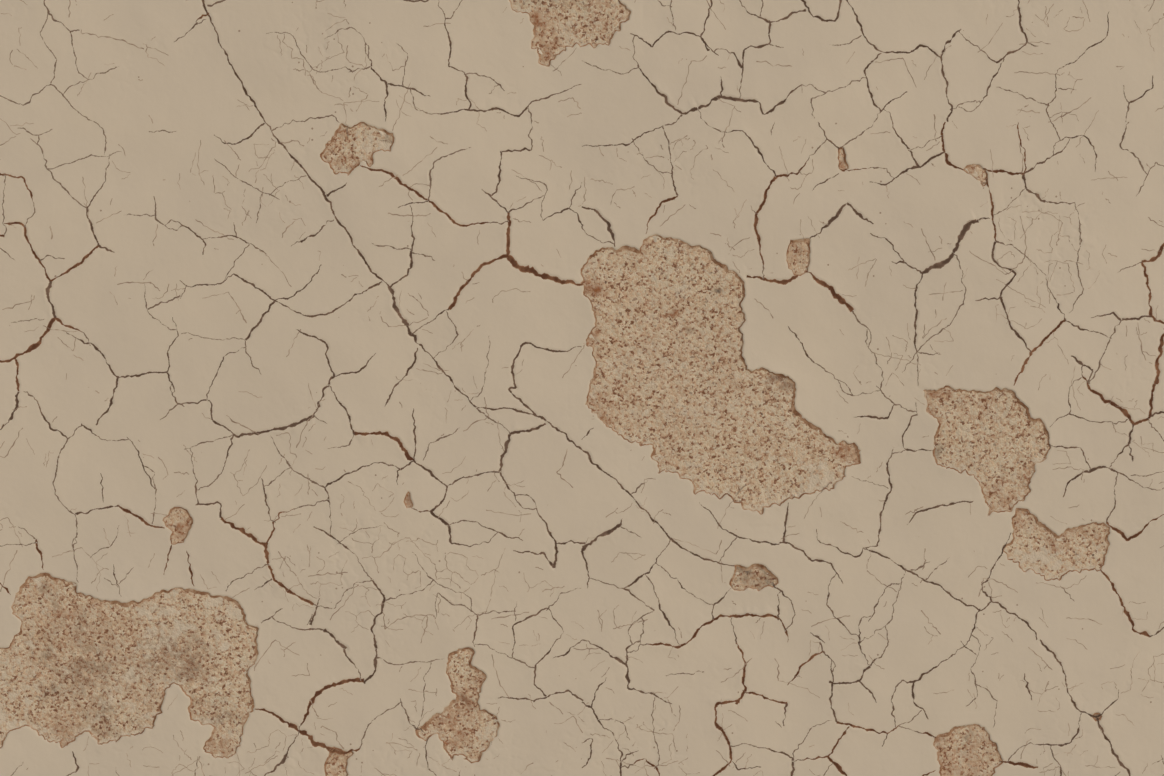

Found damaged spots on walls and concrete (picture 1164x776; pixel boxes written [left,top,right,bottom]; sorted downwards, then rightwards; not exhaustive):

peeling [509,0,631,67]
crack [1036,2,1090,32]
peeling [581,234,861,515]
crack [905,501,973,525]
peeling [923,386,1110,581]
crack [0,517,44,595]
crack [186,552,219,589]
crack [1101,570,1164,638]
peeling [0,573,259,758]
peeling [415,647,500,763]
crack [67,736,99,776]
peeling [933,724,1003,776]